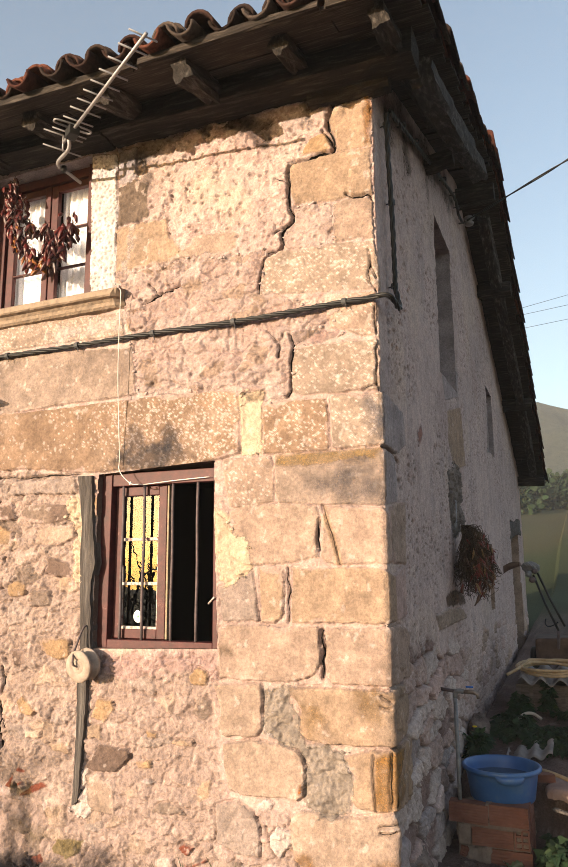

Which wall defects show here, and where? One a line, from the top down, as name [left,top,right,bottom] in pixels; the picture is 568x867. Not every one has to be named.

crack [259,108,337,293]
leakage [114,433,179,468]
crack [318,509,340,564]
crack [319,630,327,678]
crack [0,671,8,747]